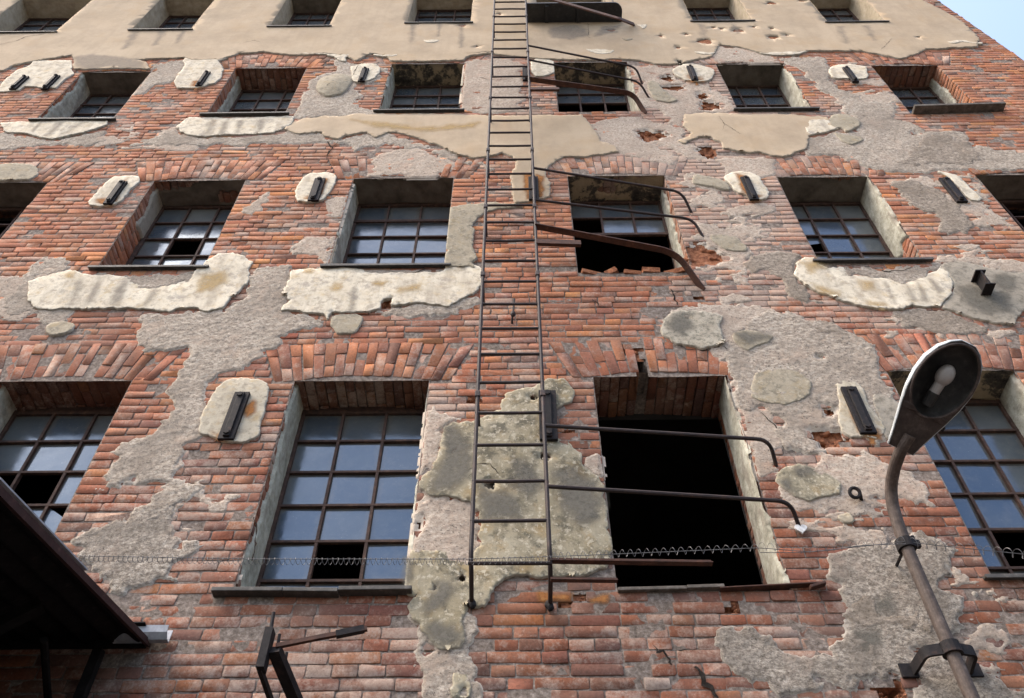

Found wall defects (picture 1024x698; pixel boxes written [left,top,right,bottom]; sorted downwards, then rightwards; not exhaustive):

peeling [0,39,1024,596]
peeling [407,378,613,698]
crack [653,645,719,698]
peeling [660,293,964,698]
peeling [910,530,1024,698]